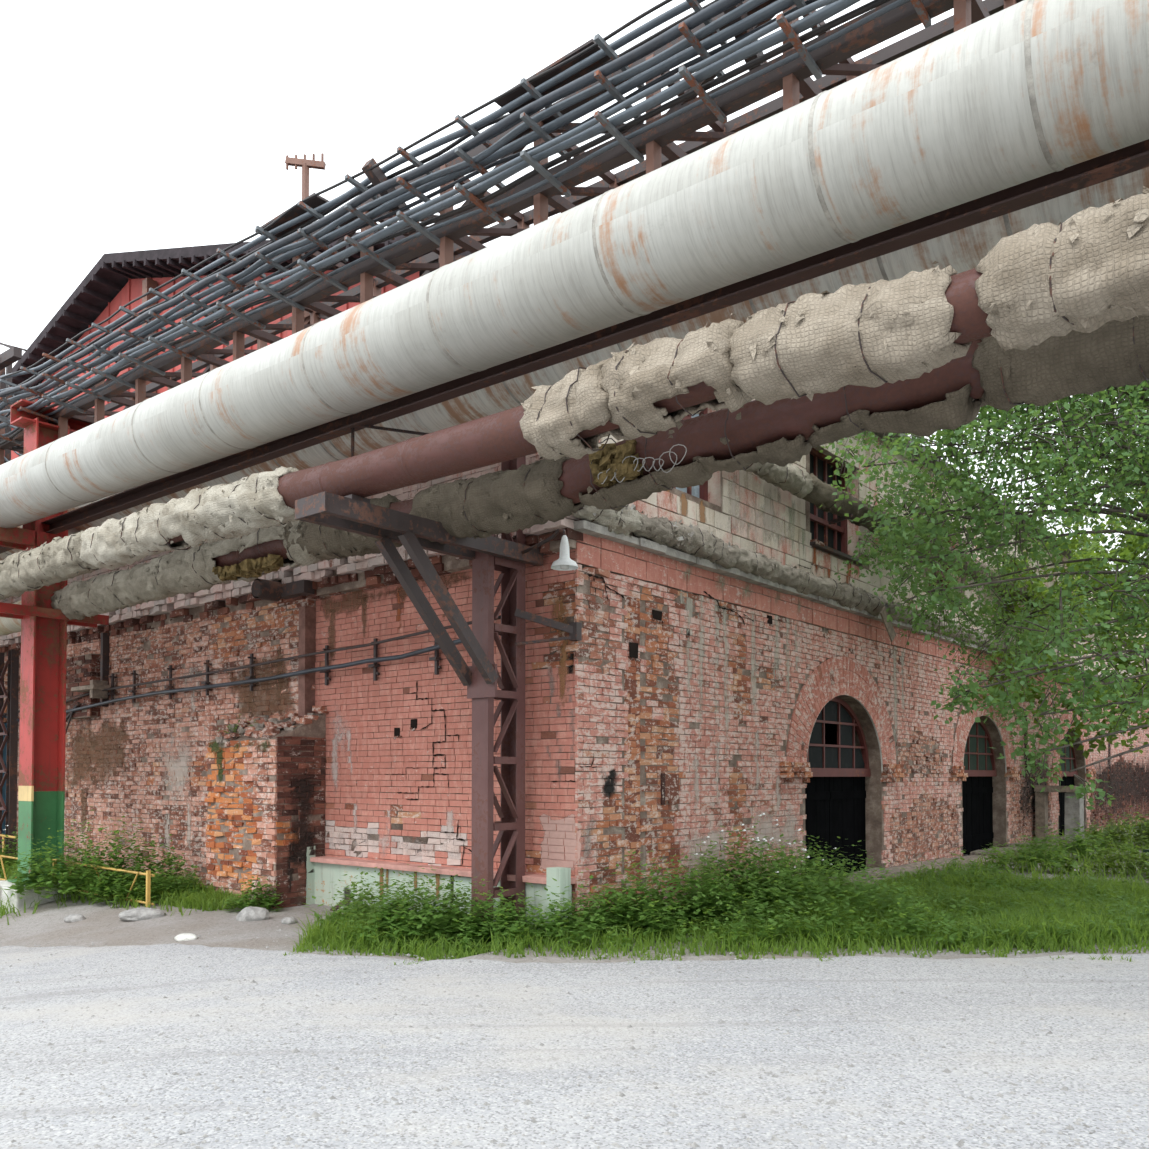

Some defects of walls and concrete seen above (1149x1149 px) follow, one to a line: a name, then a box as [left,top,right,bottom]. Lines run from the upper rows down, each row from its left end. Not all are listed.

crack [386,682,459,800]
spalling [325,804,468,866]
crack [444,820,471,910]